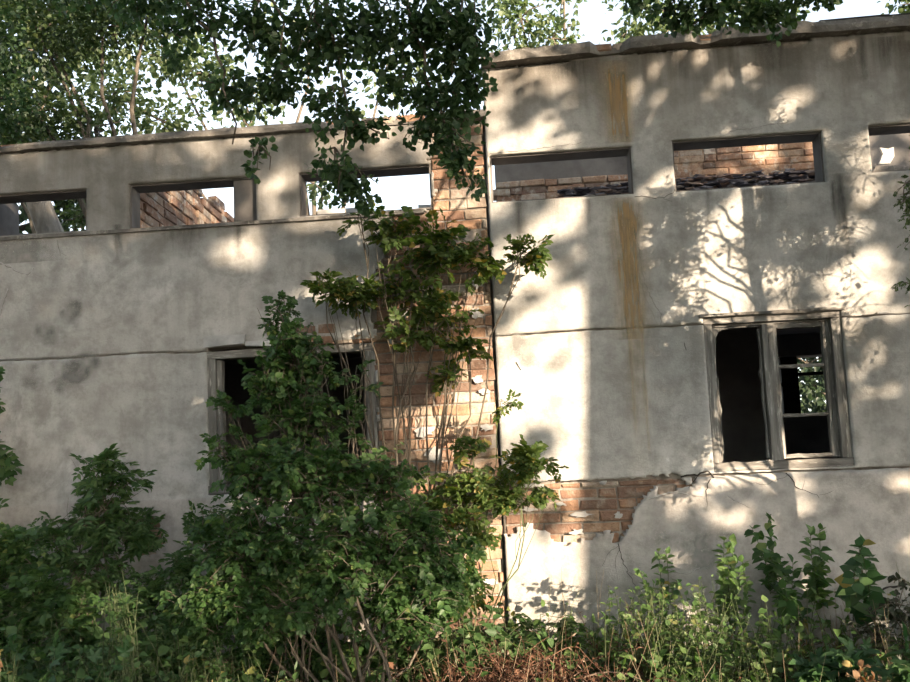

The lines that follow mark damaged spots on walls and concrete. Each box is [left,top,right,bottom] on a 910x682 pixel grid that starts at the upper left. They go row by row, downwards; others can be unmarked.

rust [608,64,629,137]
rust [617,201,643,335]
spalling [374,125,694,654]
crack [680,471,715,505]